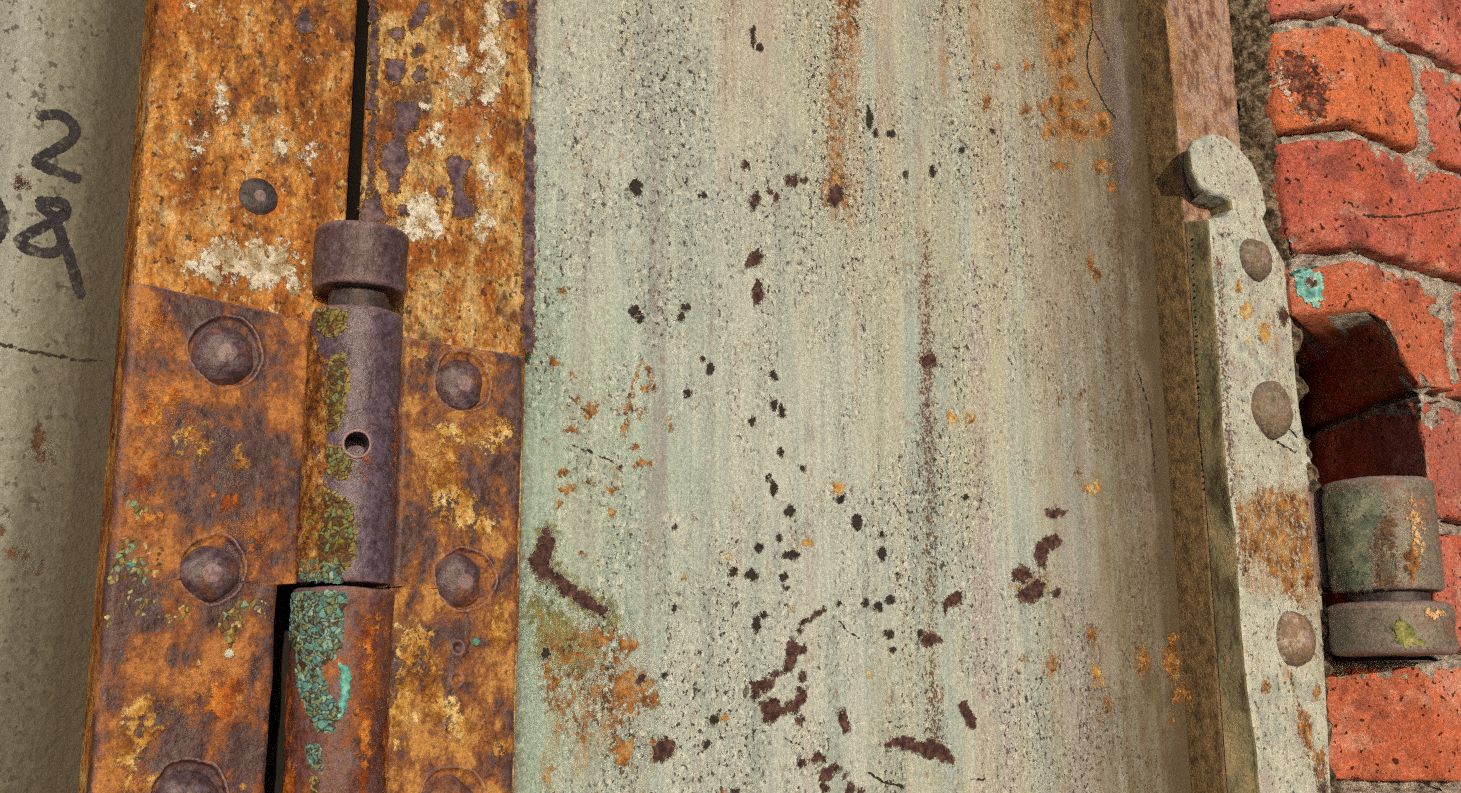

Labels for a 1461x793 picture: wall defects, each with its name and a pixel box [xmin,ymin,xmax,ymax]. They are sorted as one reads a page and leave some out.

rust [820,0,862,178]
rust [1019,0,1112,171]
rust [208,444,251,513]
rust [295,331,332,578]
rust [421,416,521,536]
rust [549,356,674,517]
rust [1213,227,1316,609]
rust [111,684,183,793]
rust [203,673,250,732]
rust [282,674,297,793]
rust [353,611,511,793]
rust [488,593,662,767]